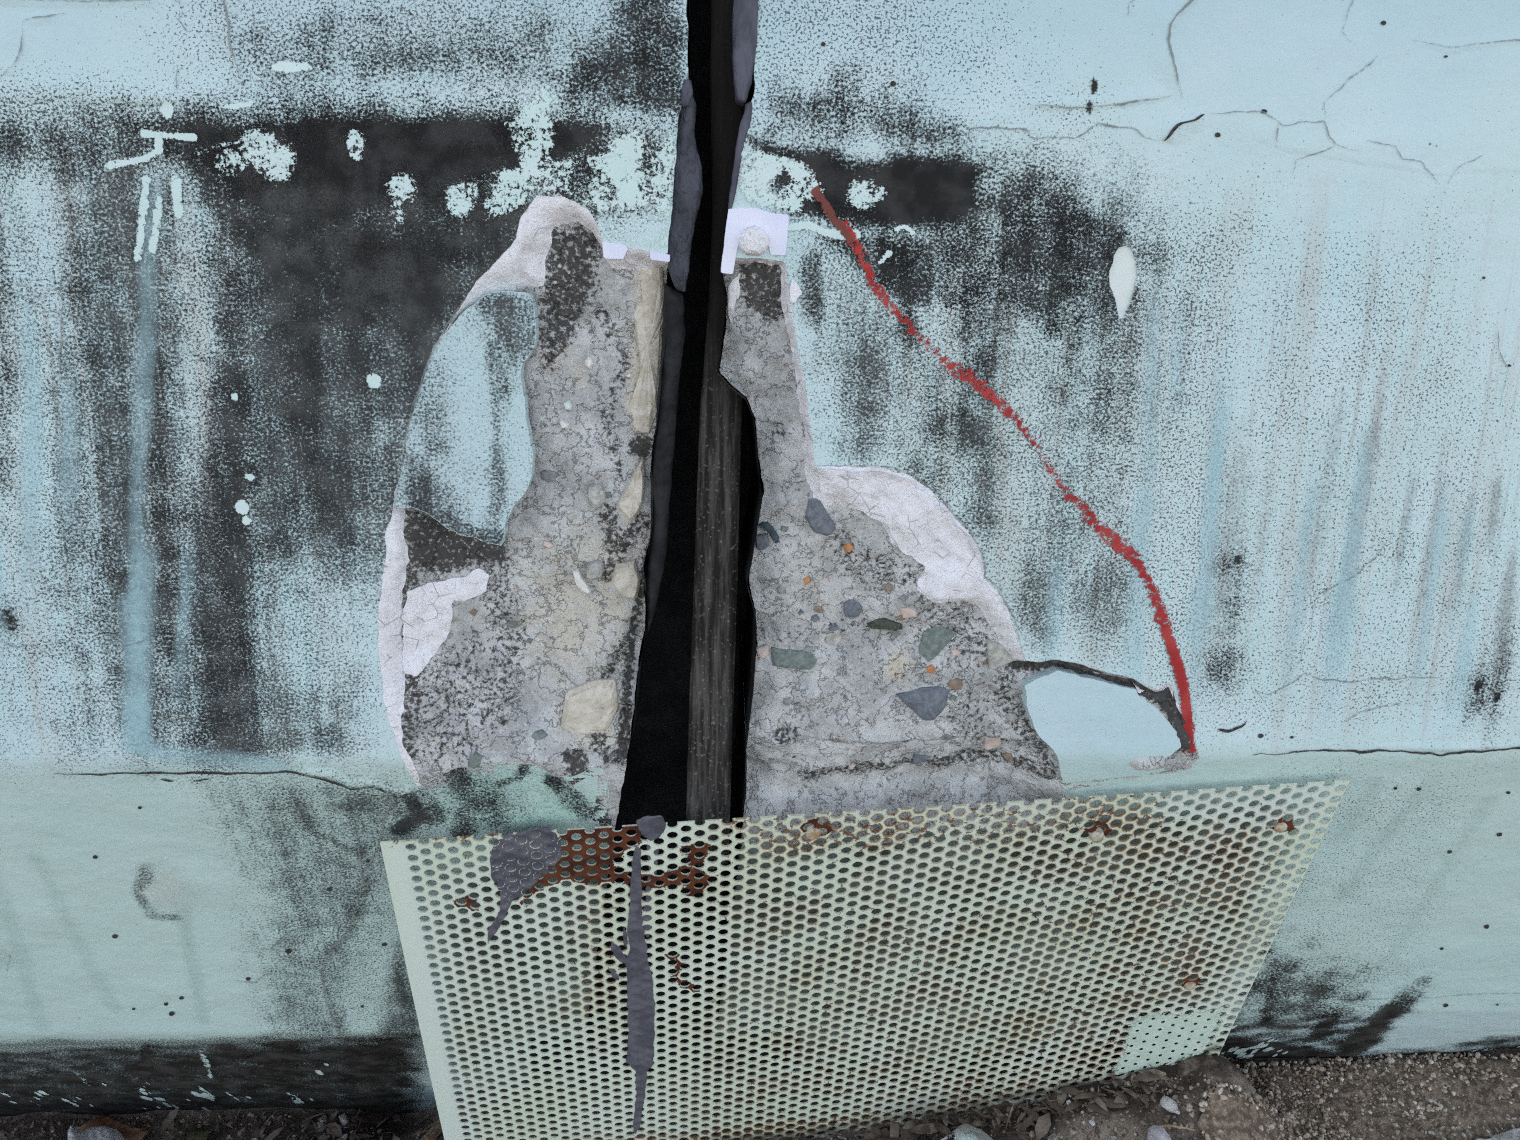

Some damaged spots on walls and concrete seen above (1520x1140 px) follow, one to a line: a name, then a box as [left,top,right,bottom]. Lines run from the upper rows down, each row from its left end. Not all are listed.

crack [964,0,1483,182]
leakage [739,59,1208,660]
peeling [1109,245,1137,319]
crack [1498,330,1509,401]
leakage [0,0,688,1117]
spalling [378,196,668,846]
spalling [719,258,1200,847]
crack [817,465,1520,756]
rust [520,826,711,907]
leakage [1208,926,1520,1059]